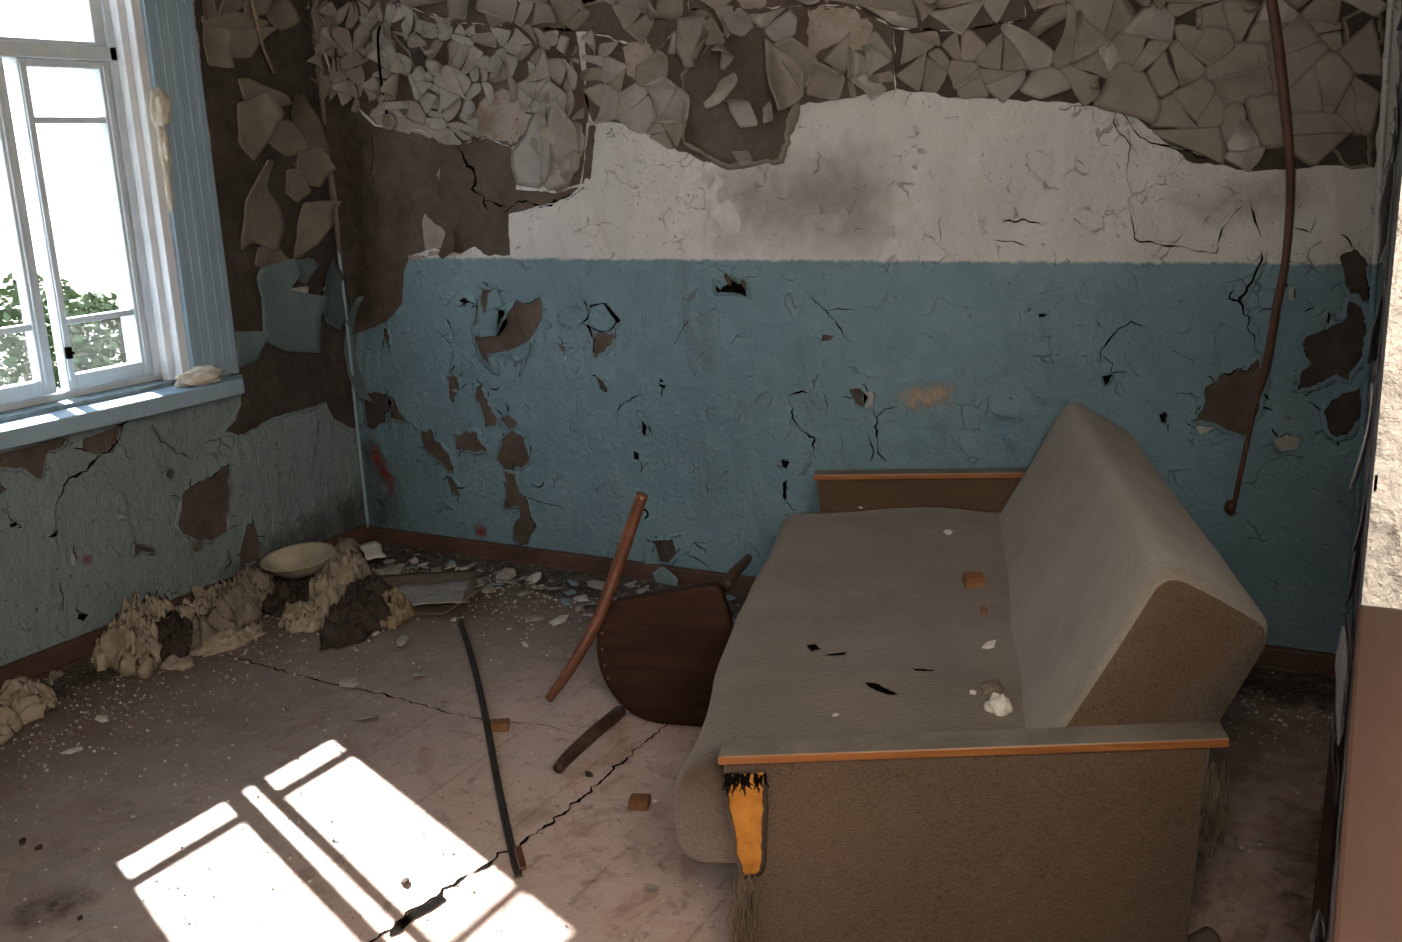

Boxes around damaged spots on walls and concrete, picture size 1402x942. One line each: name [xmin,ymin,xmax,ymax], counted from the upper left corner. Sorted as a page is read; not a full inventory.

crack [996,217,1046,246]
crack [1060,99,1314,354]
crack [1096,318,1146,373]
peeling [192,0,1402,807]
peeling [0,420,131,495]
peeling [132,532,157,557]
peeling [161,460,266,566]
crack [368,724,667,942]